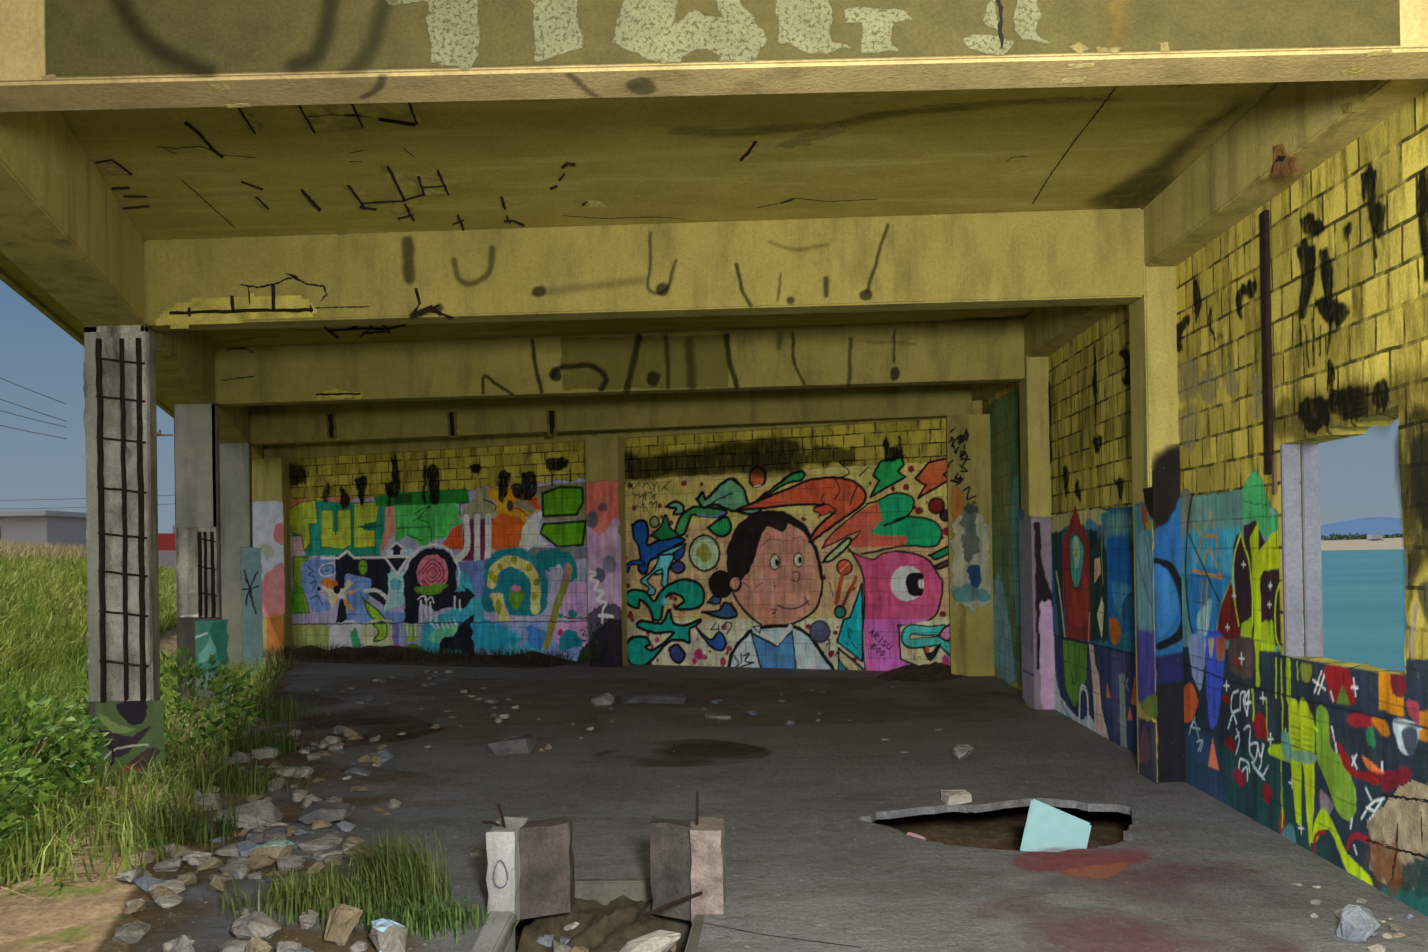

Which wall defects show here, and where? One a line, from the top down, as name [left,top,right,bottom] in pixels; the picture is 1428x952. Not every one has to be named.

crack [996,0,1004,48]
peeling [1365,780,1428,898]